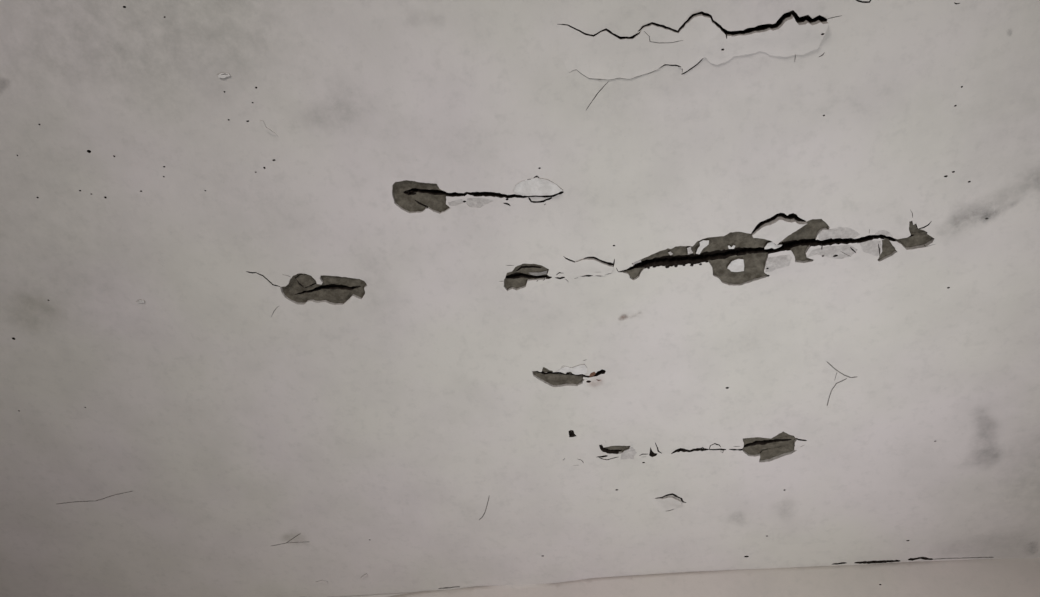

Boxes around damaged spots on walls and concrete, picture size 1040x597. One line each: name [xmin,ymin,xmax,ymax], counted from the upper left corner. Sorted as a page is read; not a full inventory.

spalling [392,167,564,214]
spalling [504,211,935,291]
spalling [246,271,367,317]
spalling [532,359,606,387]
spalling [598,432,807,463]